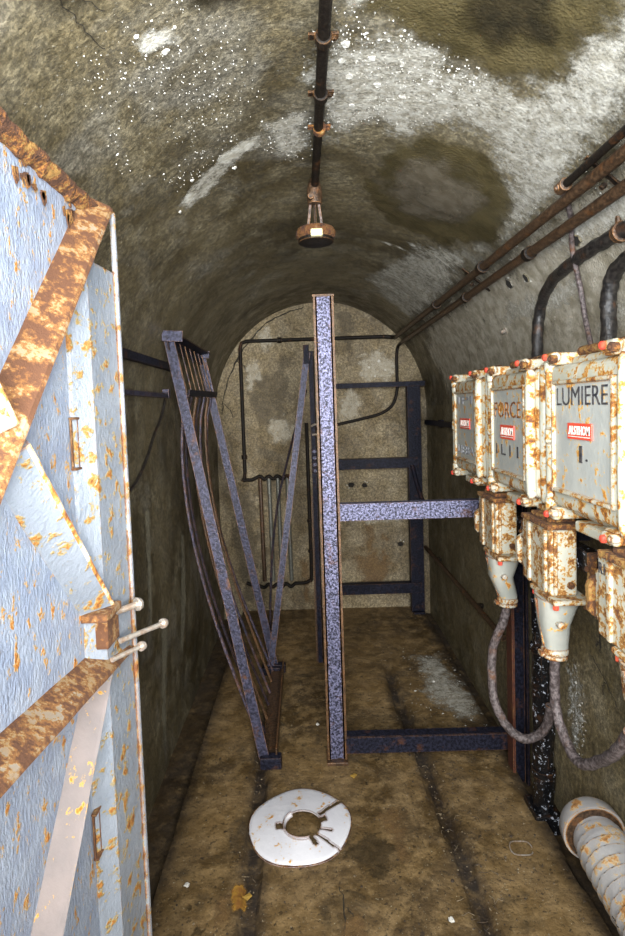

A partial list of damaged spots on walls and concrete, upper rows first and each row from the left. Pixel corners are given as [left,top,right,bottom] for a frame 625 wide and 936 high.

damp [76,13,313,213]
damp [303,0,625,391]